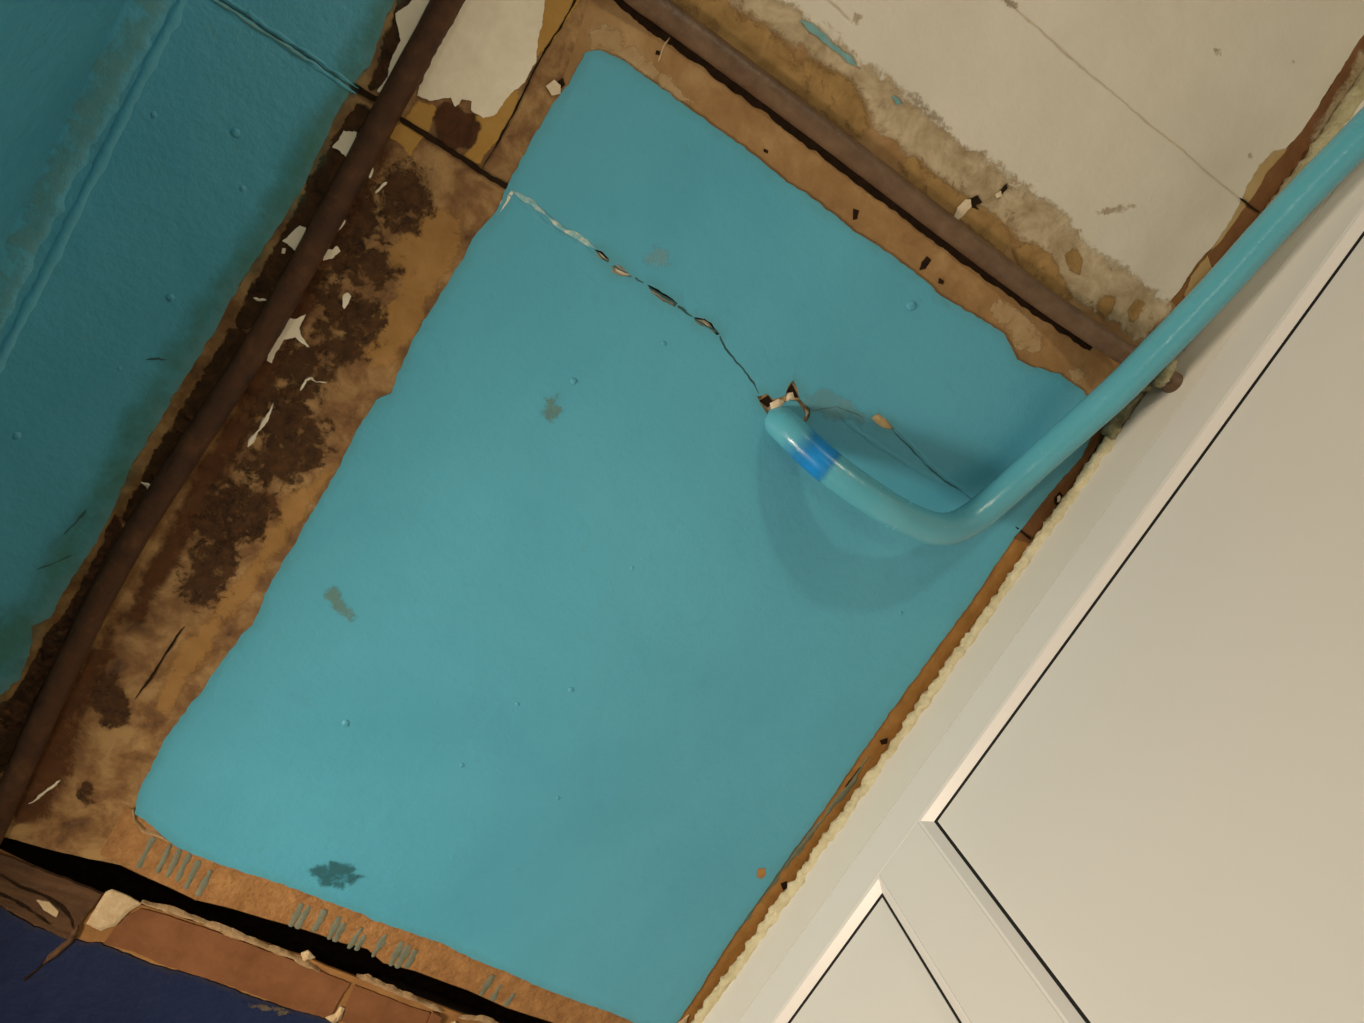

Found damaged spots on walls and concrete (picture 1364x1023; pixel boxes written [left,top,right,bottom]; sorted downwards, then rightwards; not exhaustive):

corrosion [0,0,412,824]
peeling [0,0,430,720]
corrosion [433,101,480,149]
crack [211,0,759,393]
peeling [316,0,1120,396]
crack [614,0,1092,351]
damp [672,0,1172,341]
damp [990,299,1041,353]
damp [1184,148,1288,297]
crack [0,875,74,929]
peeling [5,299,634,1023]
peeling [677,424,1106,1023]